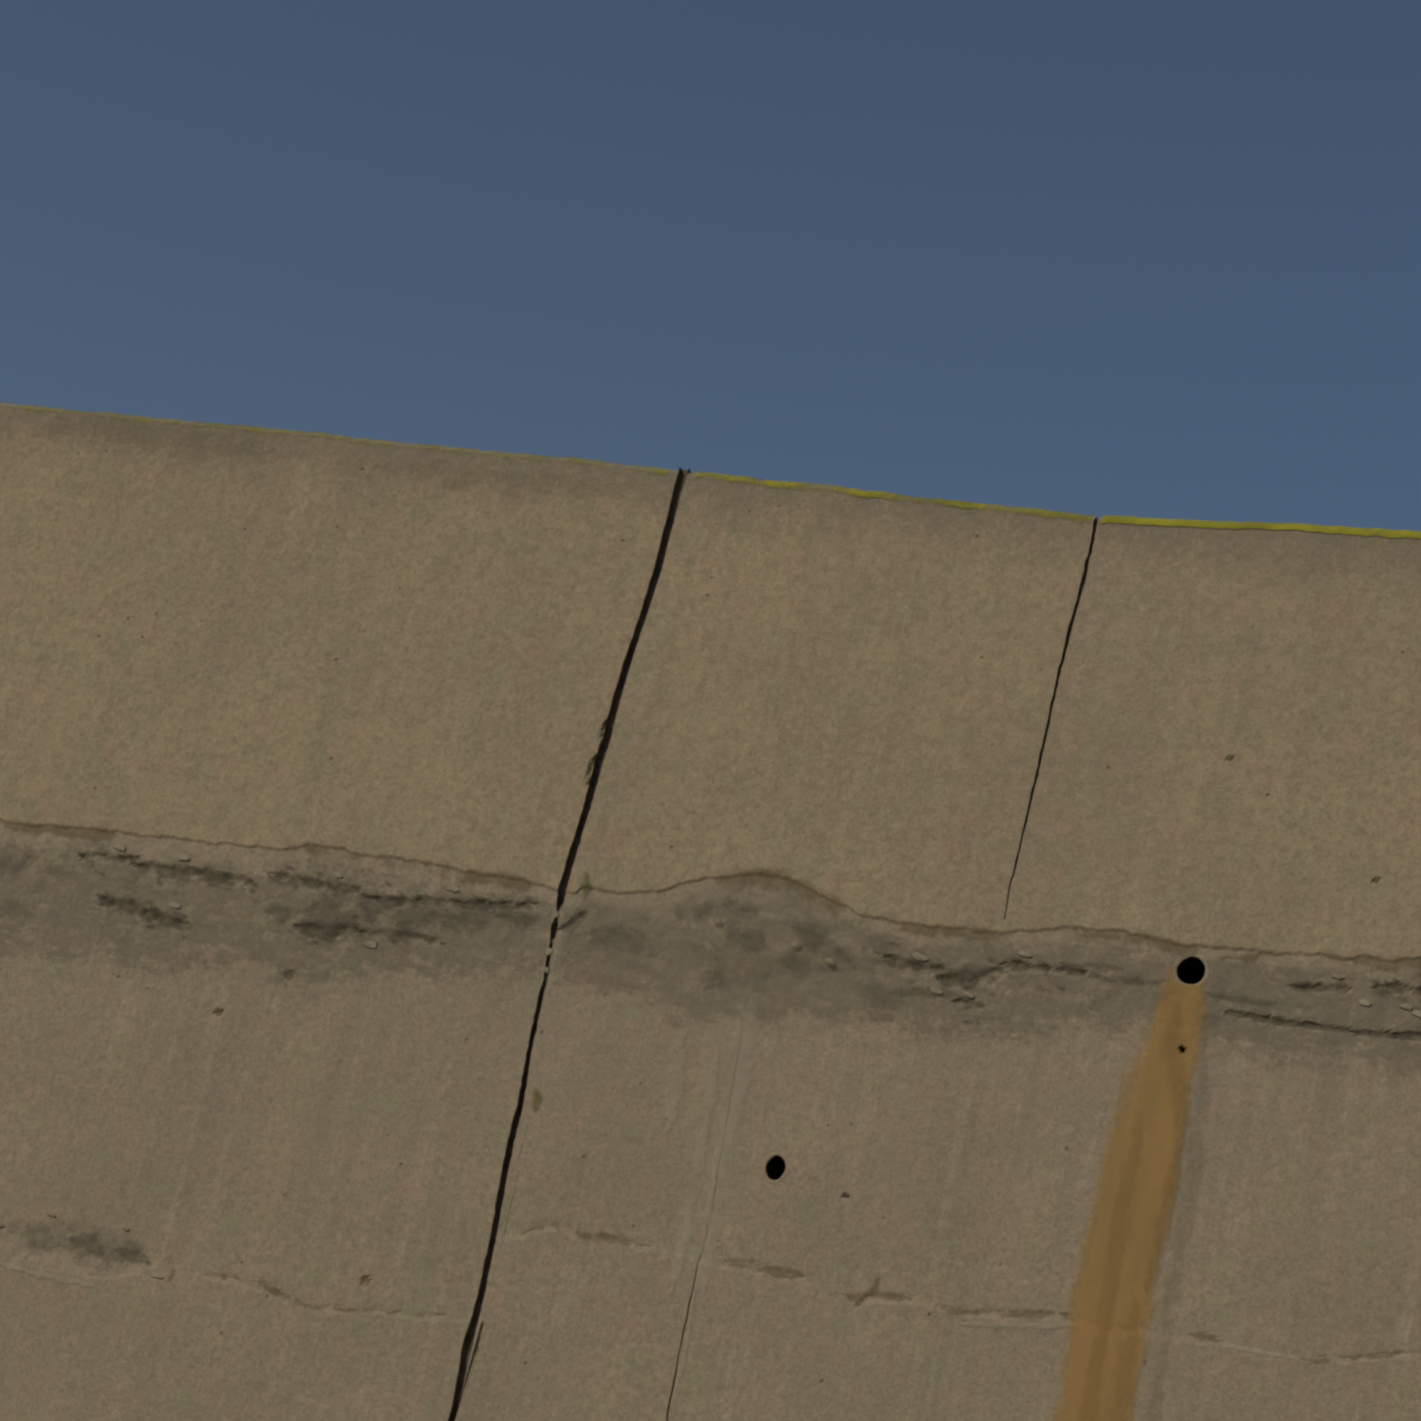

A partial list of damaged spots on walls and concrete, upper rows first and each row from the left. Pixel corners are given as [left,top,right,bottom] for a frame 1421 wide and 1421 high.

crack [1004,518,1099,919]
crack [448,467,690,1421]
corrosion [1058,977,1202,1421]